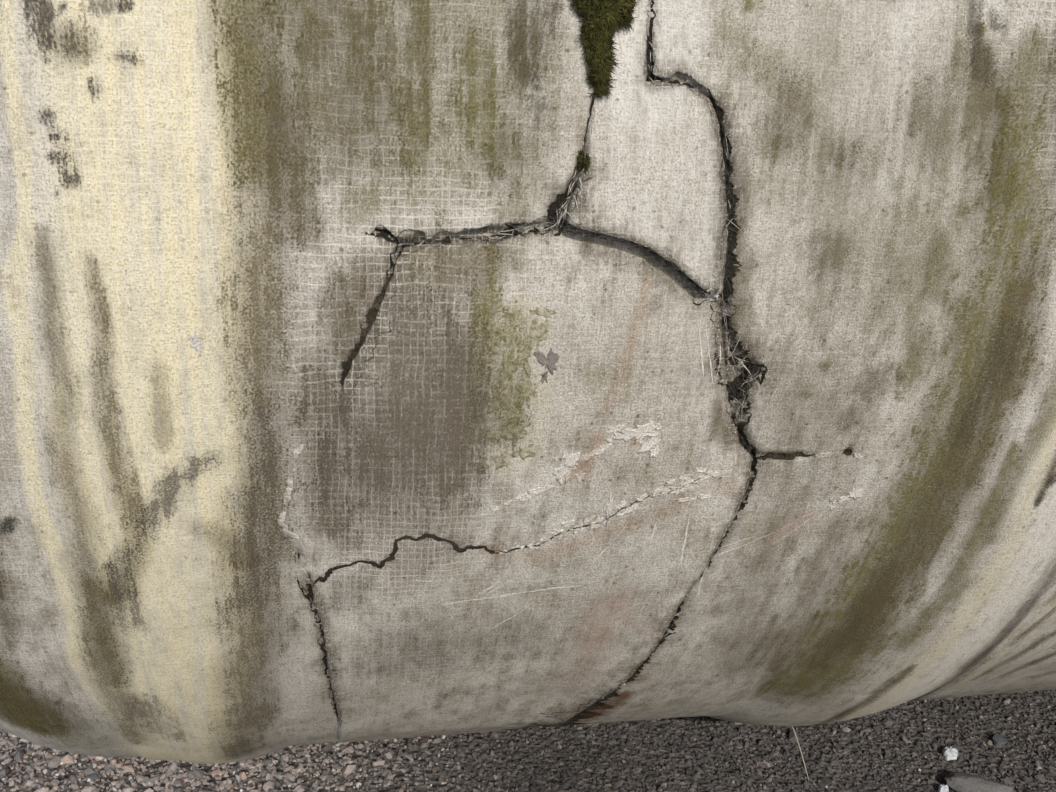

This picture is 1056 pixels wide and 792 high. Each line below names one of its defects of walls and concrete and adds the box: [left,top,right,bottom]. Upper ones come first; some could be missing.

damp [38,108,81,195]
damp [23,0,135,63]
damp [458,0,562,175]
damp [911,0,1011,180]
damp [0,224,219,745]
damp [194,0,536,760]
crack [294,0,815,730]
peeling [491,421,665,511]
peeling [498,468,721,555]
damp [807,245,1056,670]
damp [783,665,918,728]
damp [909,571,1056,702]